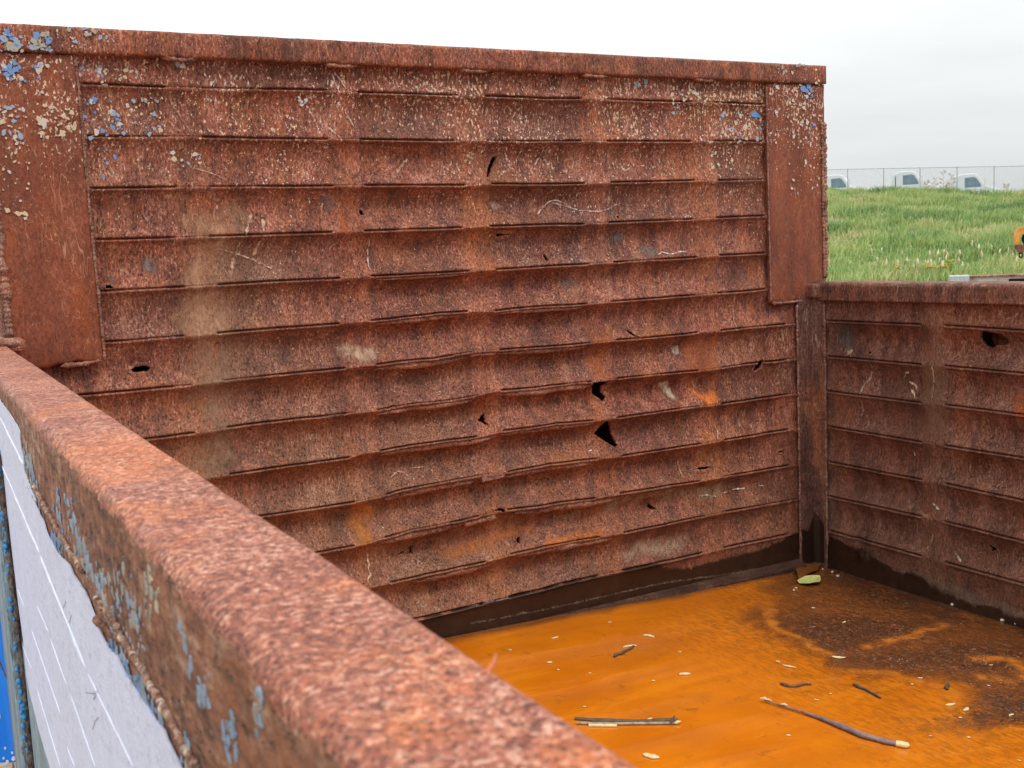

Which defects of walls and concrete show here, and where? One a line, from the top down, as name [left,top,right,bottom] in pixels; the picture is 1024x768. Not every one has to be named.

peeling [0,27,163,220]
peeling [709,63,821,195]
corrosion [689,389,718,406]
peeling [22,442,164,727]
leakage [421,513,1024,638]
peeling [177,620,211,710]
peeling [221,709,239,764]
peeling [252,686,264,737]